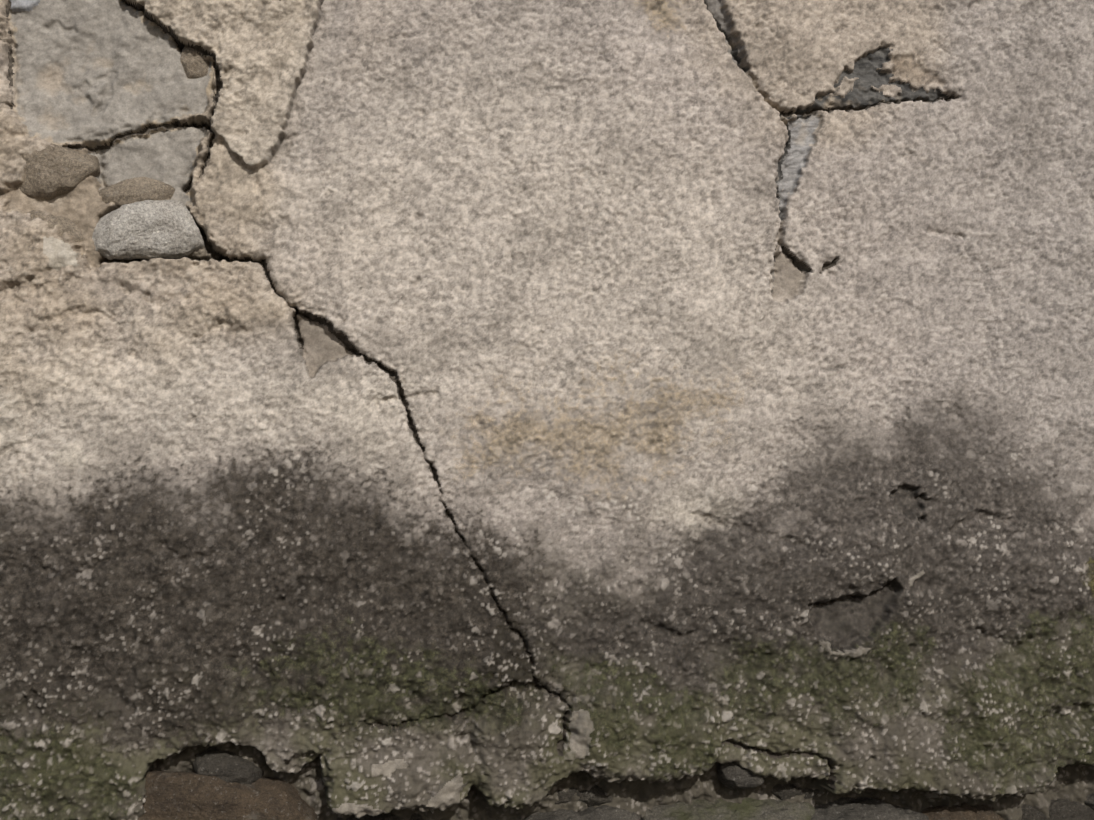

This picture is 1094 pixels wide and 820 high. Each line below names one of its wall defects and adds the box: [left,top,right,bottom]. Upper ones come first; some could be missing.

spalling [2,0,266,271]
crack [62,0,223,194]
crack [704,2,959,294]
spalling [776,46,954,220]
crack [187,221,464,540]
crack [371,686,508,731]
crack [503,614,570,756]
water stain [0,398,1094,755]
spalling [808,570,925,660]